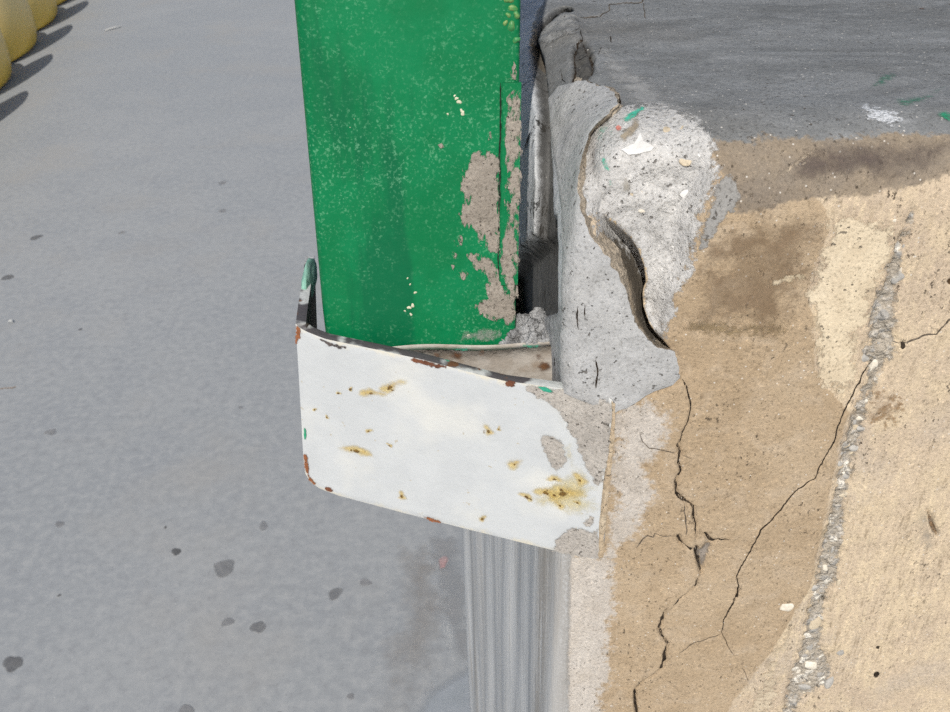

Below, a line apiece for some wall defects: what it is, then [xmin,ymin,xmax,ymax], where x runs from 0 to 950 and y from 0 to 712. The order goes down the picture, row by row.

peeling [451,63,523,325]
crack [893,319,950,344]
rust [336,383,394,396]
rust [345,447,371,456]
rust [521,474,586,509]
crack [636,358,872,694]
crack [632,683,640,712]